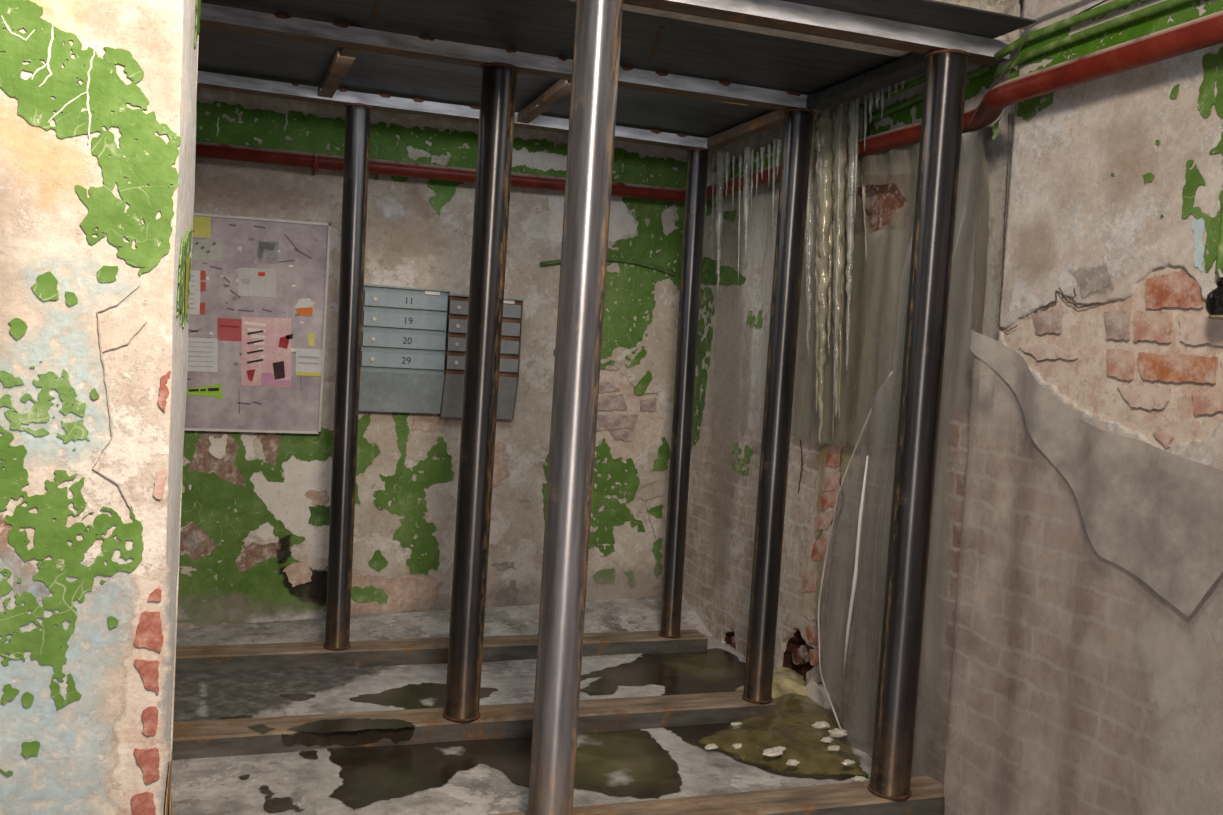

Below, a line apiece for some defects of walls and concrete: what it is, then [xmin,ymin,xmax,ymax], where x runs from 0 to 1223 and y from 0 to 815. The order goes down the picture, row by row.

crack [1,15,54,87]
crack [47,42,98,144]
peeling [368,122,478,215]
peeling [1198,46,1223,169]
peeling [0,0,346,815]
peeling [589,147,687,588]
flaking render [999,160,1223,451]
peeling [351,412,454,616]
water stain [173,665,532,815]
water stain [580,643,746,697]
water stain [574,722,871,800]
flaking render [782,444,866,782]